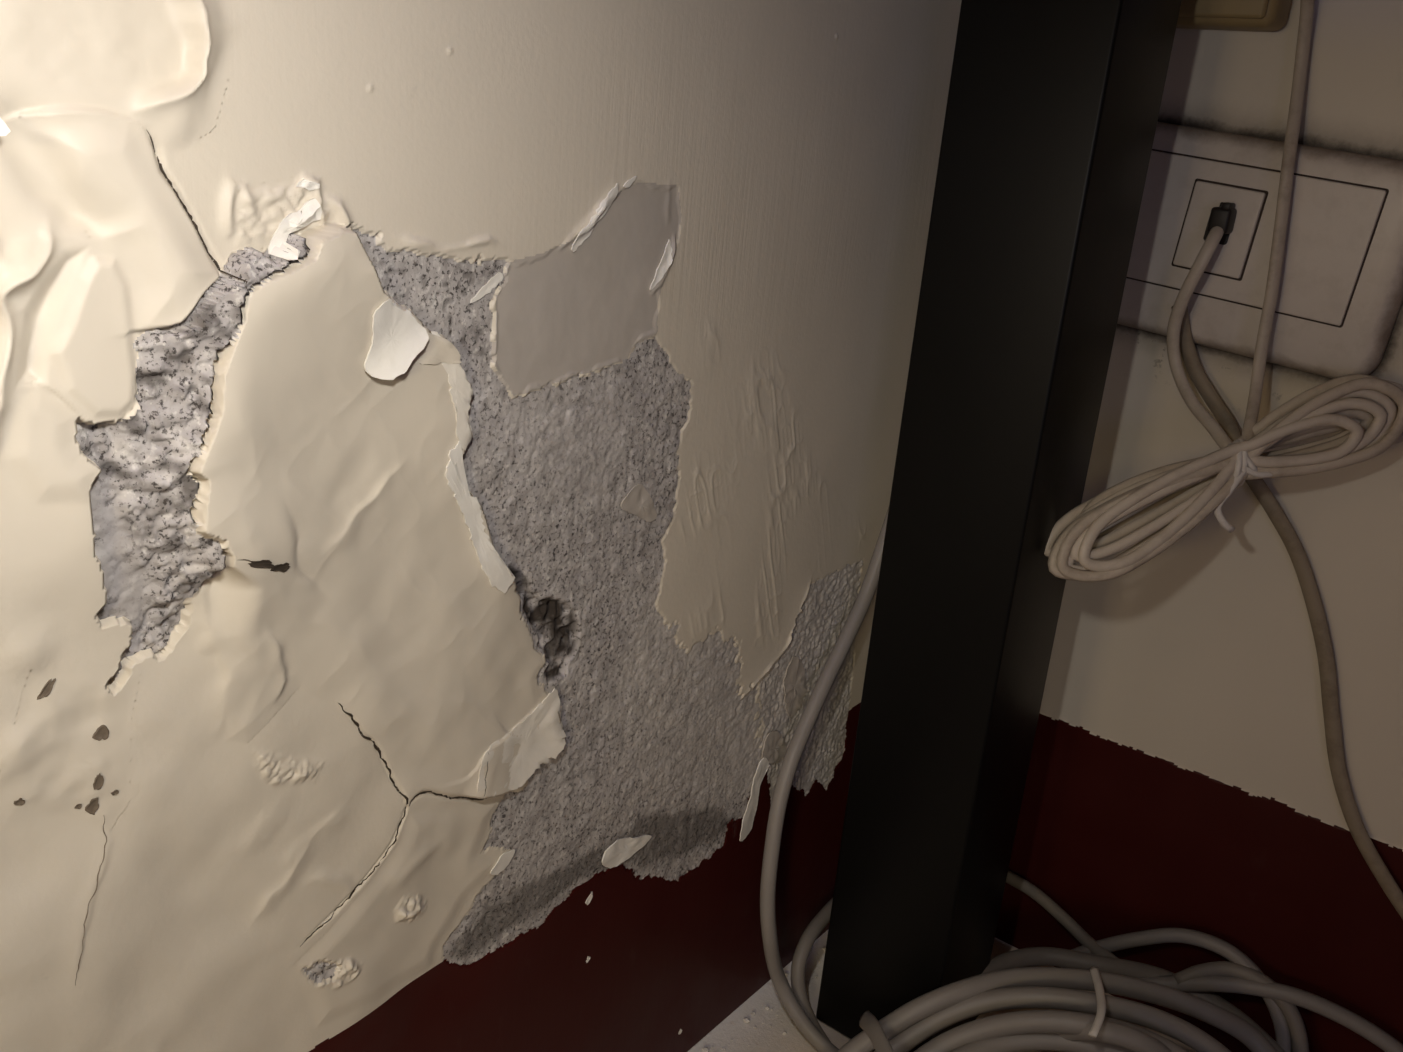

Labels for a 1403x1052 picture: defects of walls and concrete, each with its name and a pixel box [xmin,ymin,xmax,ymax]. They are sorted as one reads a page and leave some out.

spalling [0,113,864,1031]
crack [75,818,107,986]
crack [303,703,489,943]